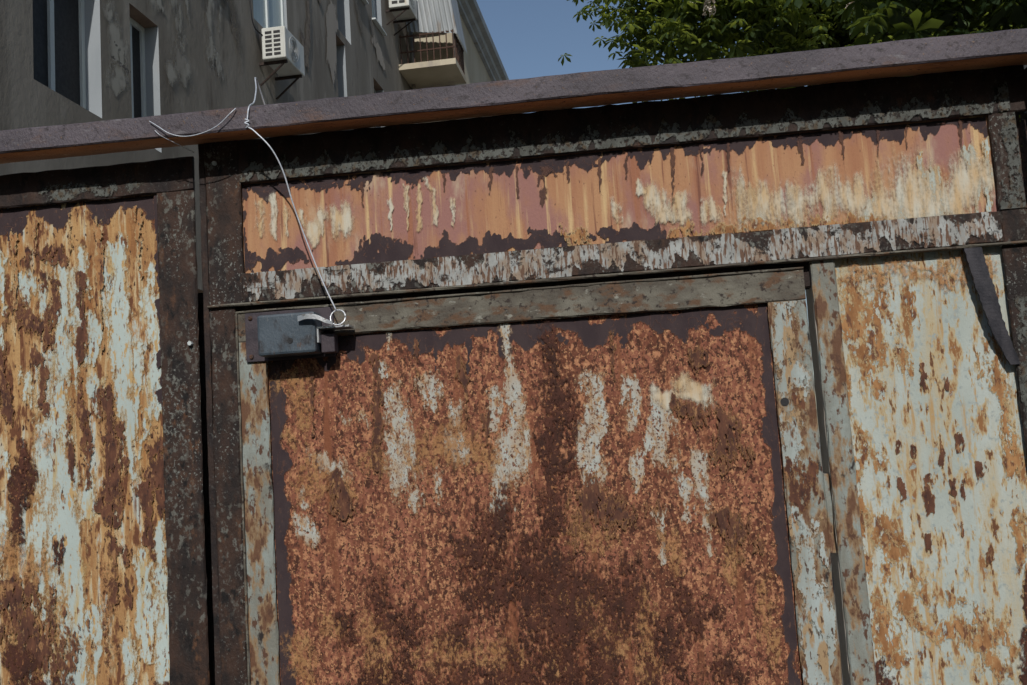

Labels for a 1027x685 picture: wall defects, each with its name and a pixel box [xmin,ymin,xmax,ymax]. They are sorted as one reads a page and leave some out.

rust [242,117,988,273]
peeling [240,81,1026,302]
peeling [0,231,162,685]
rust [0,194,165,685]
peeling [119,518,170,685]
peeling [292,485,320,548]
peeling [306,448,353,482]
peeling [339,332,470,513]
peeling [482,323,532,520]
rust [269,304,821,685]
peeling [573,369,713,566]
rust [837,273,1027,685]